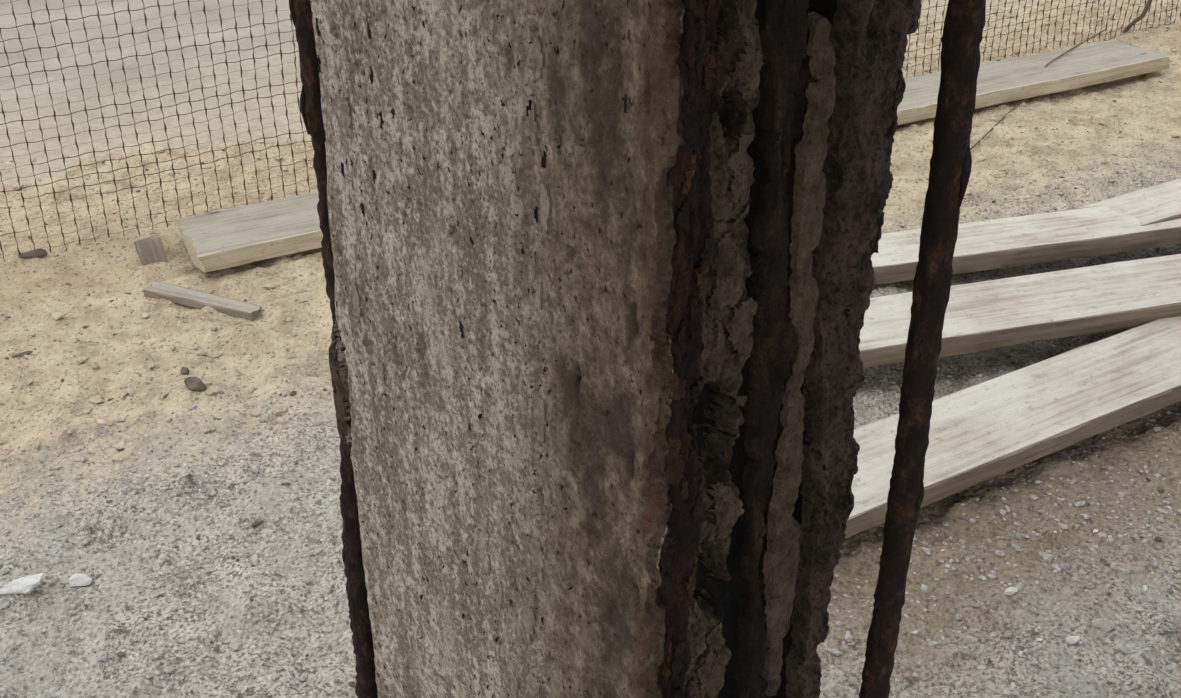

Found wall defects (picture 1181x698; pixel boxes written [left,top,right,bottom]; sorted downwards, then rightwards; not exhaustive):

peeling [717,41,765,204]
spalling [890,0,921,143]
spalling [872,211,884,253]
spalling [642,0,685,698]
rust [655,0,725,698]
peeling [685,231,758,427]
rust [732,0,816,698]
peeling [761,10,836,697]
spalling [842,375,865,397]
peeling [692,478,744,620]
spalling [840,466,858,534]
peeling [696,645,726,698]